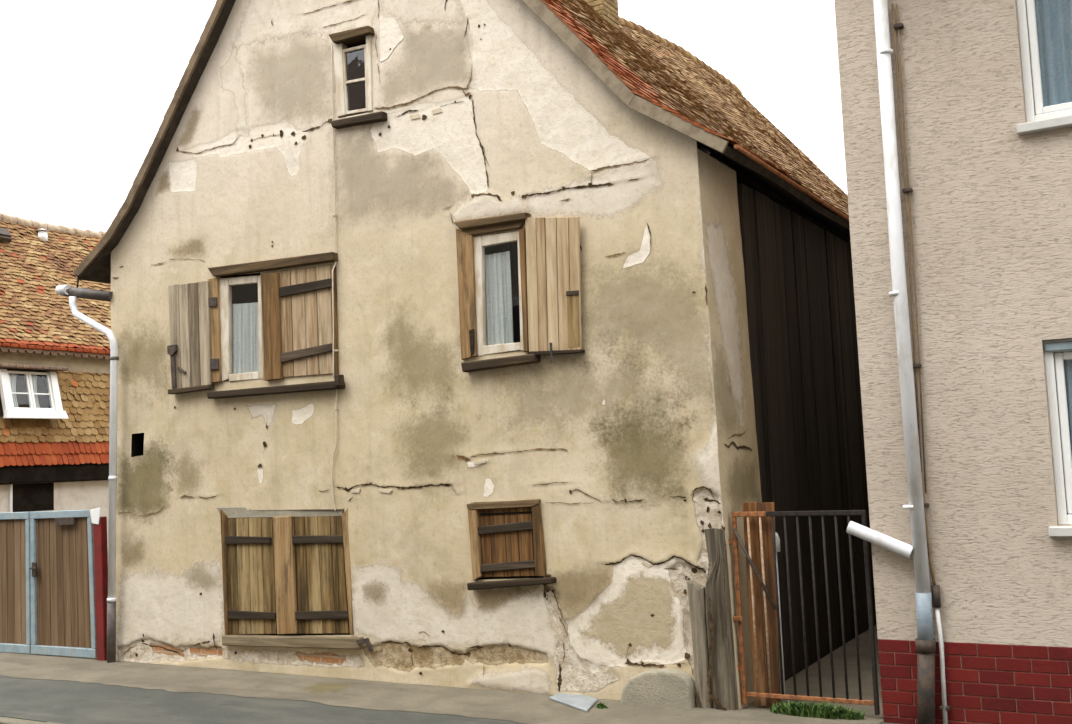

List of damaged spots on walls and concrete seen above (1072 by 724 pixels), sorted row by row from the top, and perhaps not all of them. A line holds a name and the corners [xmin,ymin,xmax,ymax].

crack [176,118,332,154]
crack [304,0,649,224]
flaking render [623,225,650,268]
crack [458,448,567,465]
crack [725,429,751,450]
crack [320,482,452,502]
crack [533,482,725,533]
flaking render [116,460,724,692]
crack [543,574,568,691]
crack [605,555,727,711]